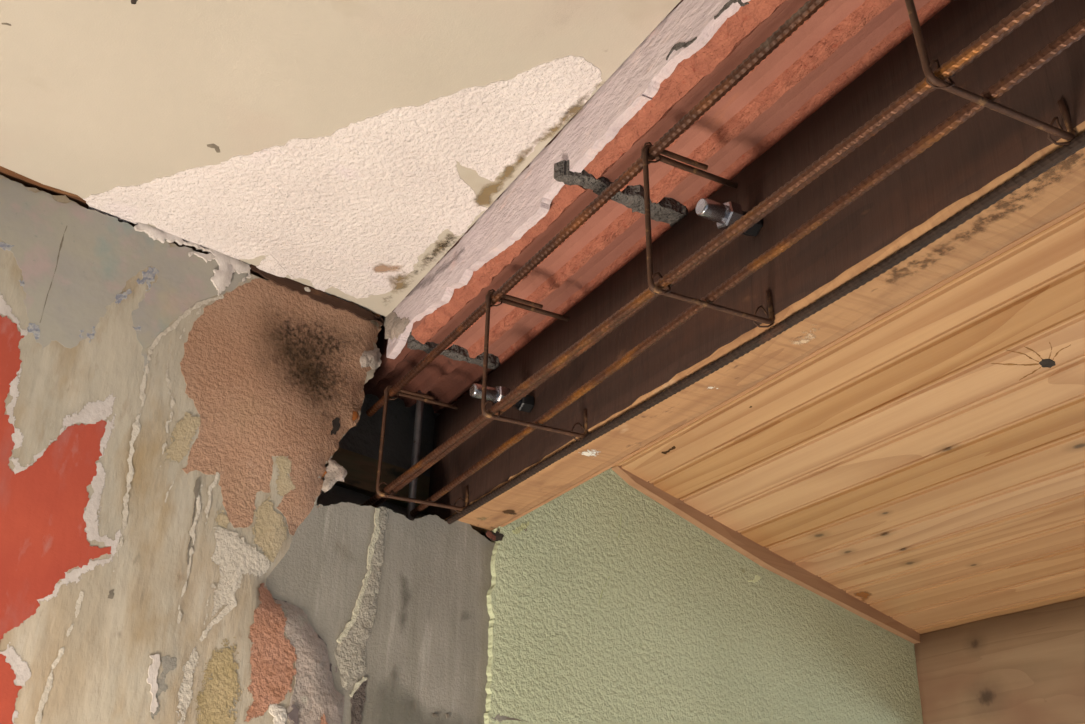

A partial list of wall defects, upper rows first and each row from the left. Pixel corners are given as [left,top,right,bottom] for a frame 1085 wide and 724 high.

spalling [0,0,1085,536]
leakage [279,321,344,400]
leakage [331,417,340,435]
spalling [147,654,177,720]
spalling [244,583,345,724]